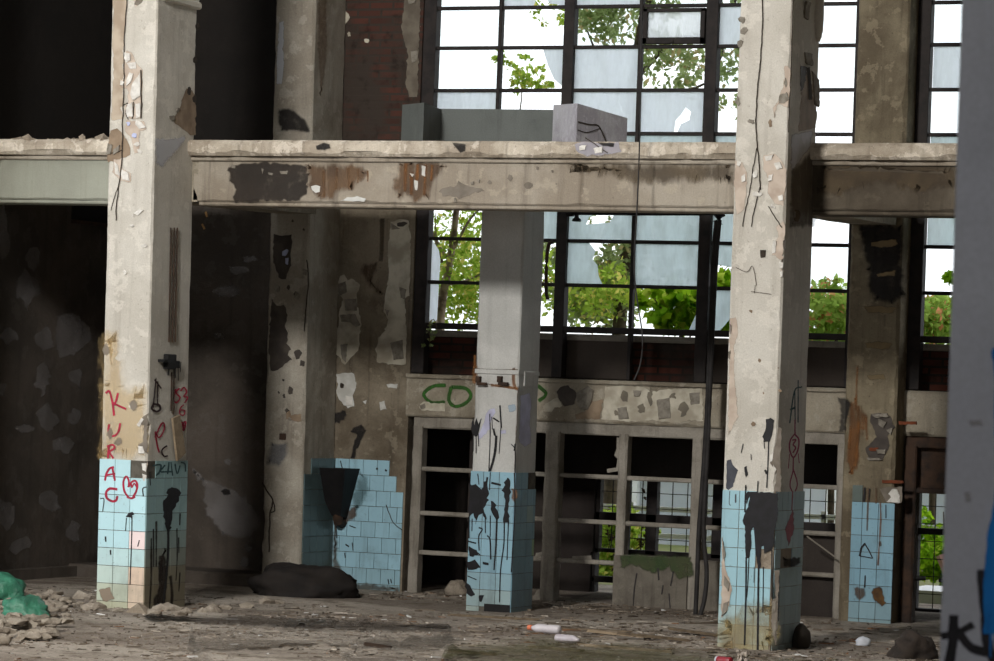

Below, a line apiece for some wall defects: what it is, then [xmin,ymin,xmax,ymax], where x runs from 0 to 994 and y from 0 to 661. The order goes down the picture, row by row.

spalling [106,0,146,183]
flaking render [157,87,196,166]
flaking render [228,162,320,203]